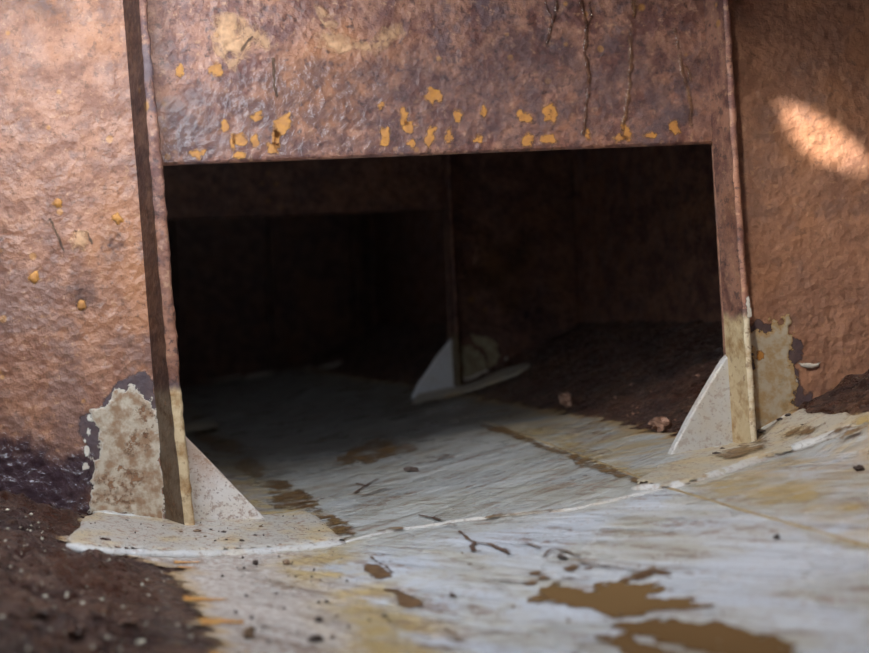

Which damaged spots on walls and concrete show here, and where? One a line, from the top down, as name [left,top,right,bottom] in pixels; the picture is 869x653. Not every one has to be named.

rust [424,86,443,104]
rust [579,0,593,139]
rust [613,42,634,143]
rust [221,112,292,159]
rust [380,127,390,147]
rust [400,107,462,148]
rust [516,103,558,146]
rust [669,120,681,135]
peeling [459,333,508,382]
peeling [746,296,820,440]
peeling [57,371,166,543]
peeling [117,366,869,653]